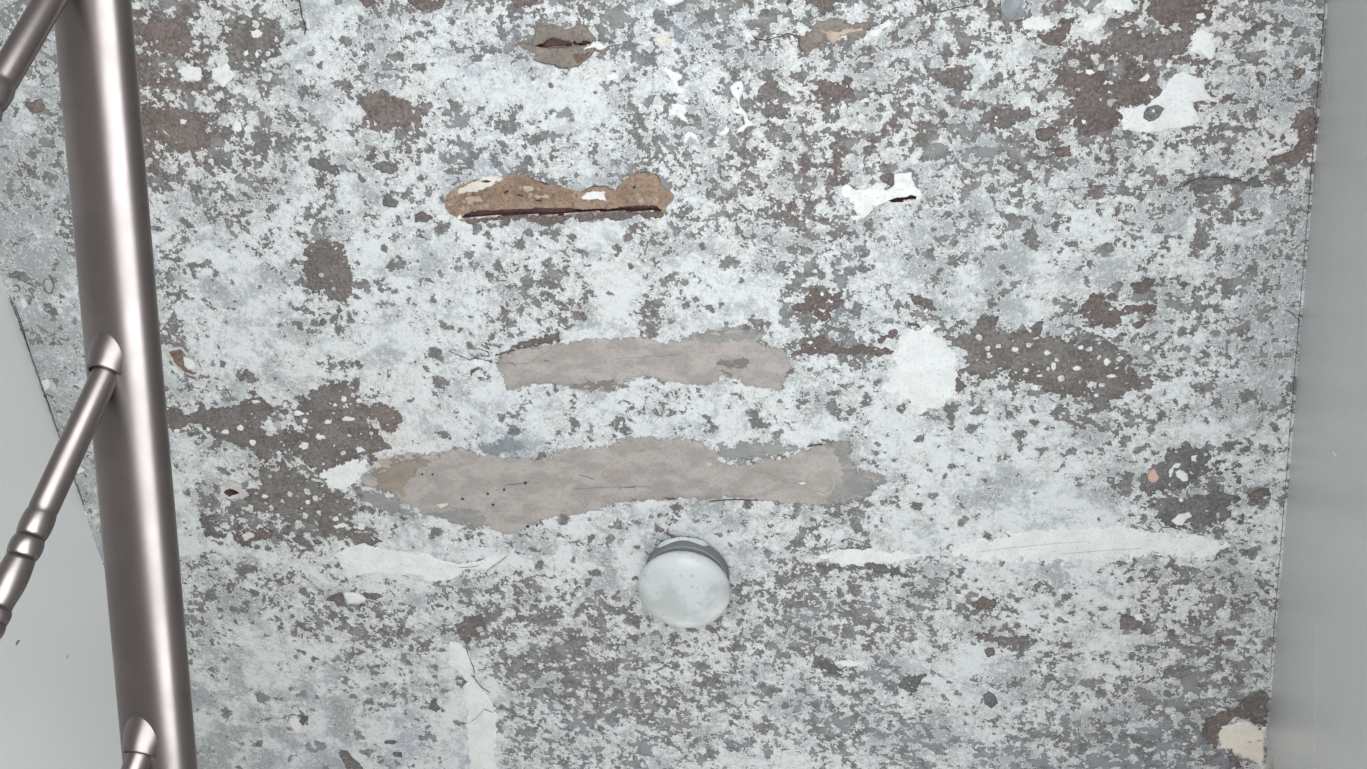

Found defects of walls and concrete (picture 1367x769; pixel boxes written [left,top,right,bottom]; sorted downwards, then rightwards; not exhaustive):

flaking render [511,0,611,69]
peeling [357,89,427,134]
peeling [305,157,340,190]
peeling [372,149,399,174]
peeling [382,193,399,208]
flaking render [414,172,674,226]
flaking render [1201,687,1270,769]